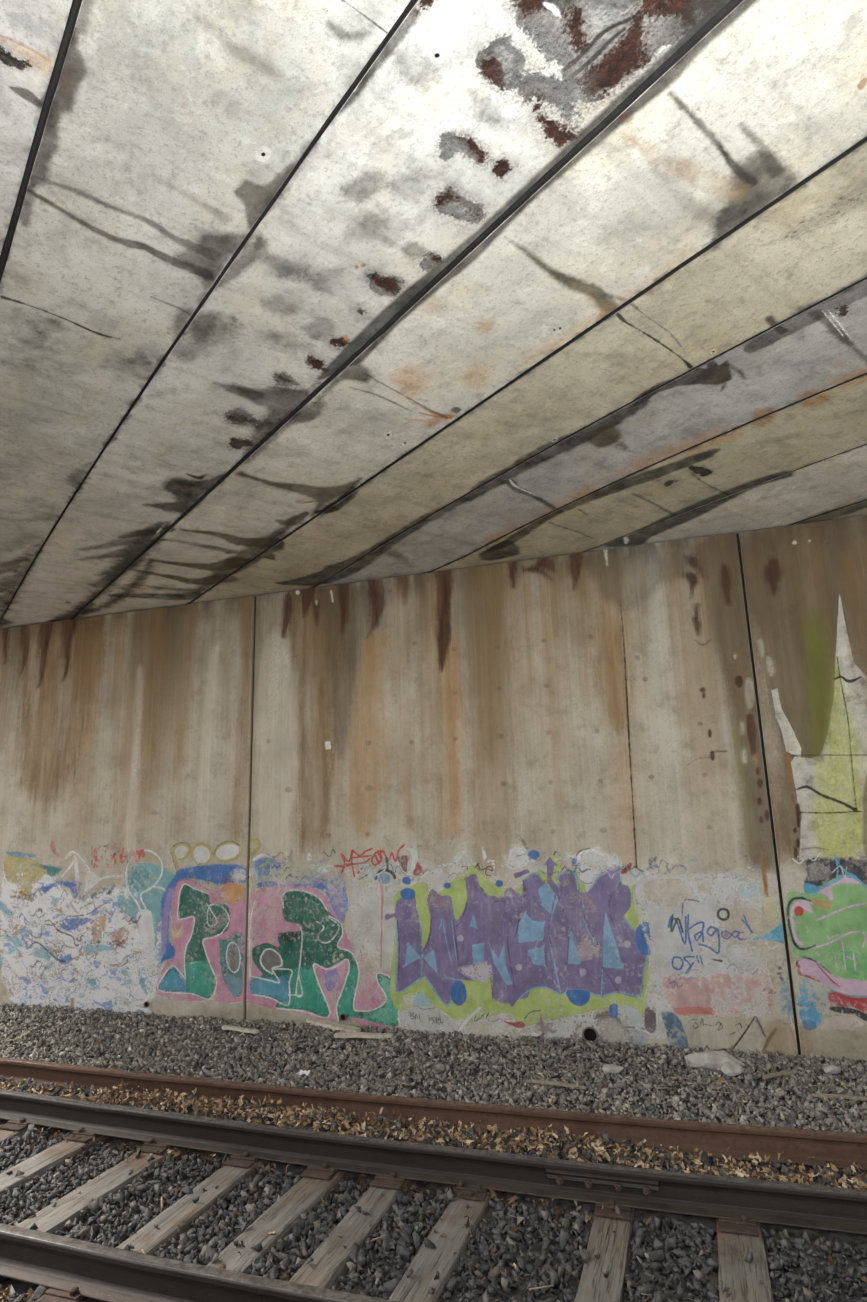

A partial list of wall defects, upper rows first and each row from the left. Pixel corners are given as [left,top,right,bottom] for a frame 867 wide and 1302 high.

leakage [319,0,756,384]
leakage [716,143,791,237]
leakage [70,214,170,262]
leakage [233,386,319,452]
rust [3,619,76,686]
leakage [37,472,358,702]
rust [282,588,318,636]
rust [338,583,349,633]
rust [368,580,384,628]
rust [438,570,451,670]
rust [509,557,554,587]
leakage [700,505,867,868]